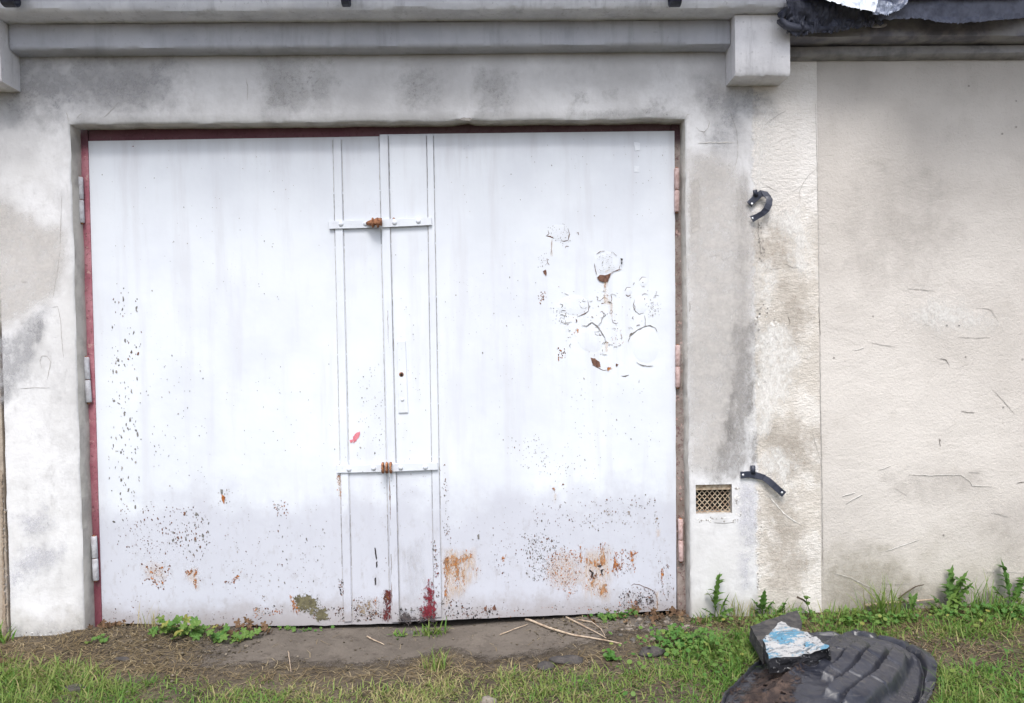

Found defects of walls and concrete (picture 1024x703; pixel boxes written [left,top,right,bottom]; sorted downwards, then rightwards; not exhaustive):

peeling [558,290,657,382]
water stain [688,160,756,471]
crack [880,465,989,494]
corrosion [419,549,477,621]
corrosion [546,543,638,597]